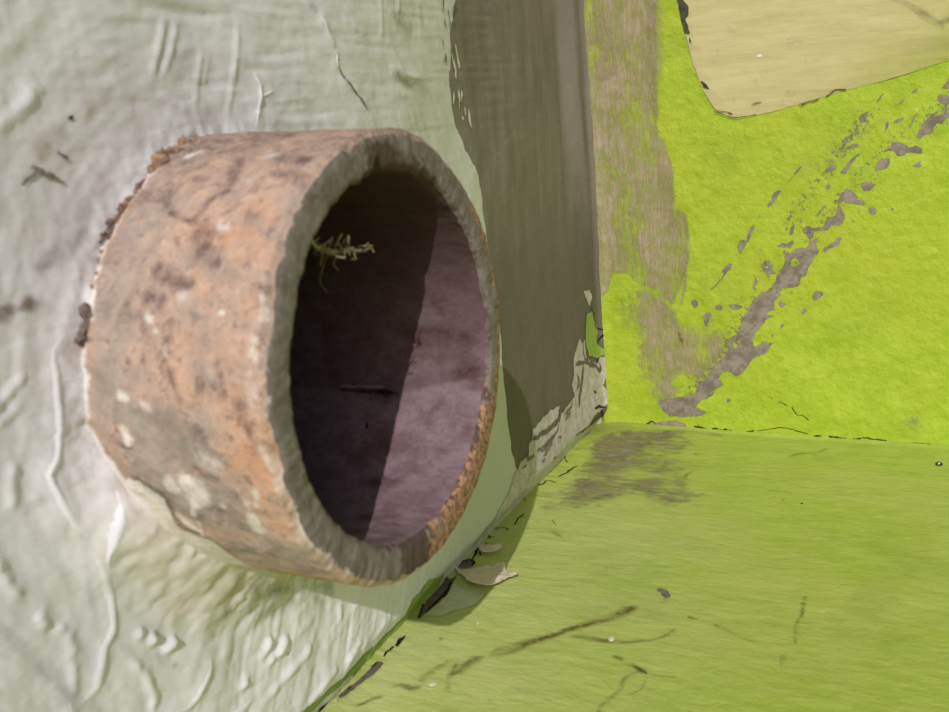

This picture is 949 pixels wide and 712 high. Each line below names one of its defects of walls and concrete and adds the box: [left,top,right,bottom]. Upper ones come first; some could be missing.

peeling [677,0,691,43]
peeling [652,78,949,427]
peeling [473,290,608,552]
peeling [425,583,486,616]